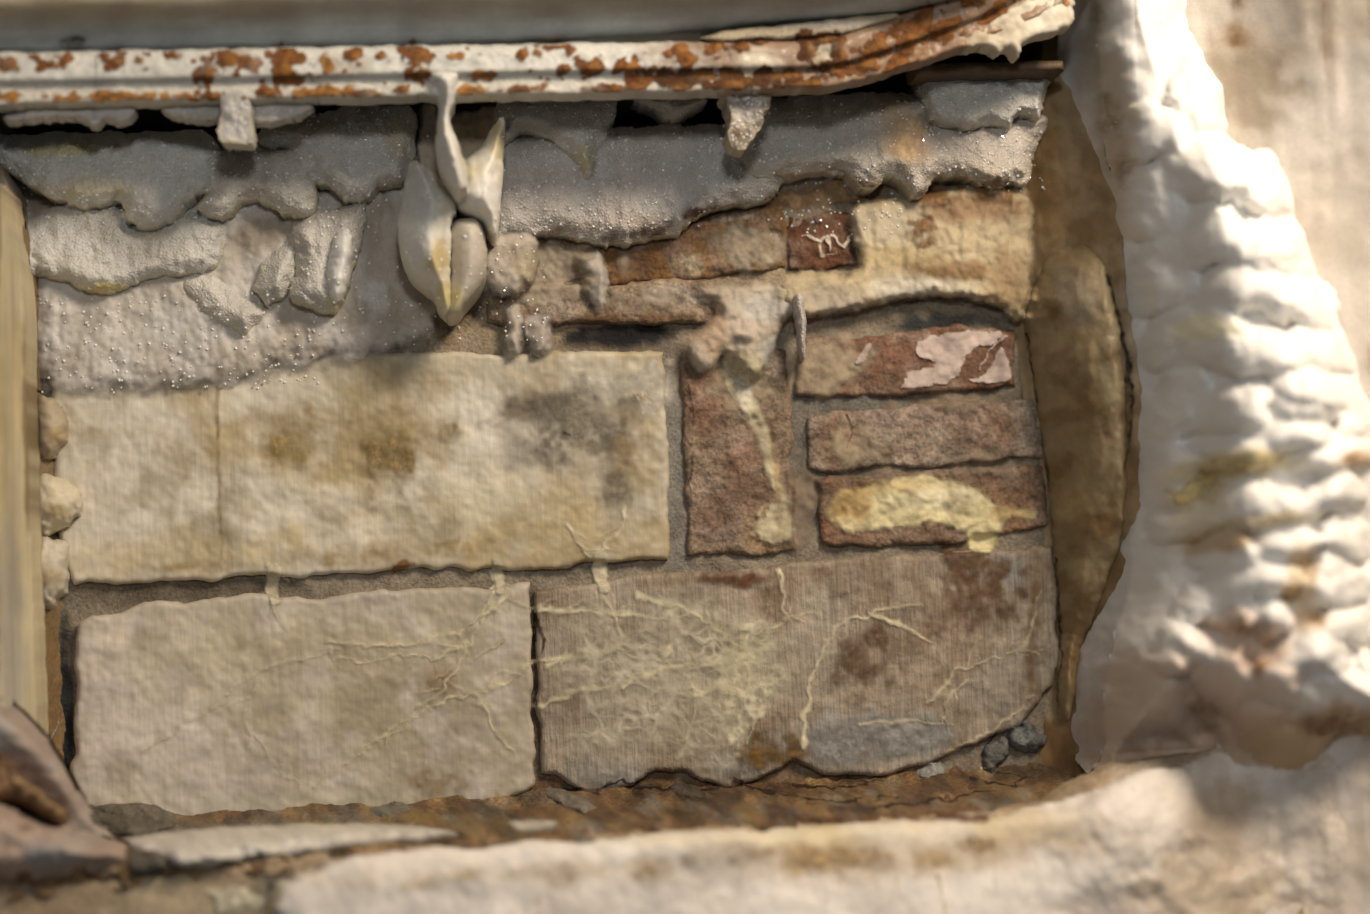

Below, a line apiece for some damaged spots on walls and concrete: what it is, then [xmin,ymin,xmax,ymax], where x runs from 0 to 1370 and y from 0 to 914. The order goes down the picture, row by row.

rust [0,90,23,103]
rust [0,52,78,72]
rust [41,0,1016,112]
efflorescence [507,229,598,306]
water stain [685,208,783,276]
water stain [807,234,851,257]
water stain [908,178,1014,248]
peeling [901,330,1012,388]
crack [1107,275,1134,470]
crack [531,610,1027,809]
spalling [69,803,177,884]
spalling [207,876,285,914]